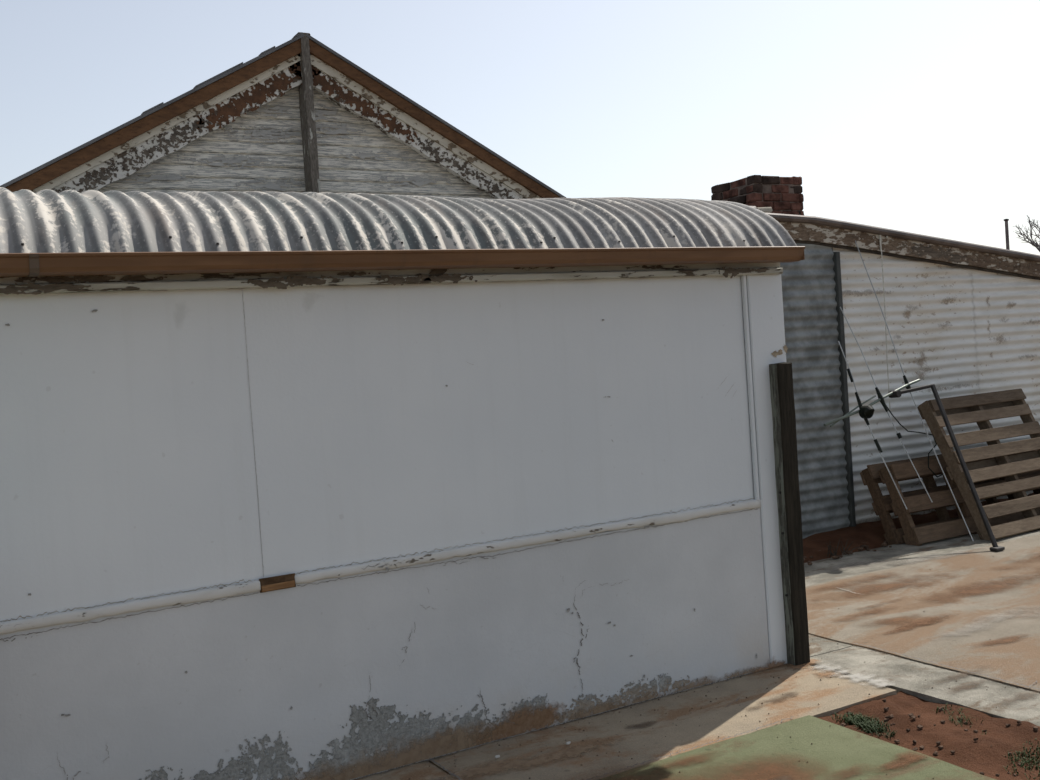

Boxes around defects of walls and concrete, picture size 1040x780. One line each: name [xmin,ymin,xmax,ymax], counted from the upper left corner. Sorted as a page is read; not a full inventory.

peeling [58,63,519,199]
peeling [0,275,167,295]
peeling [241,269,481,289]
peeling [718,267,767,278]
spalling [139,673,707,780]